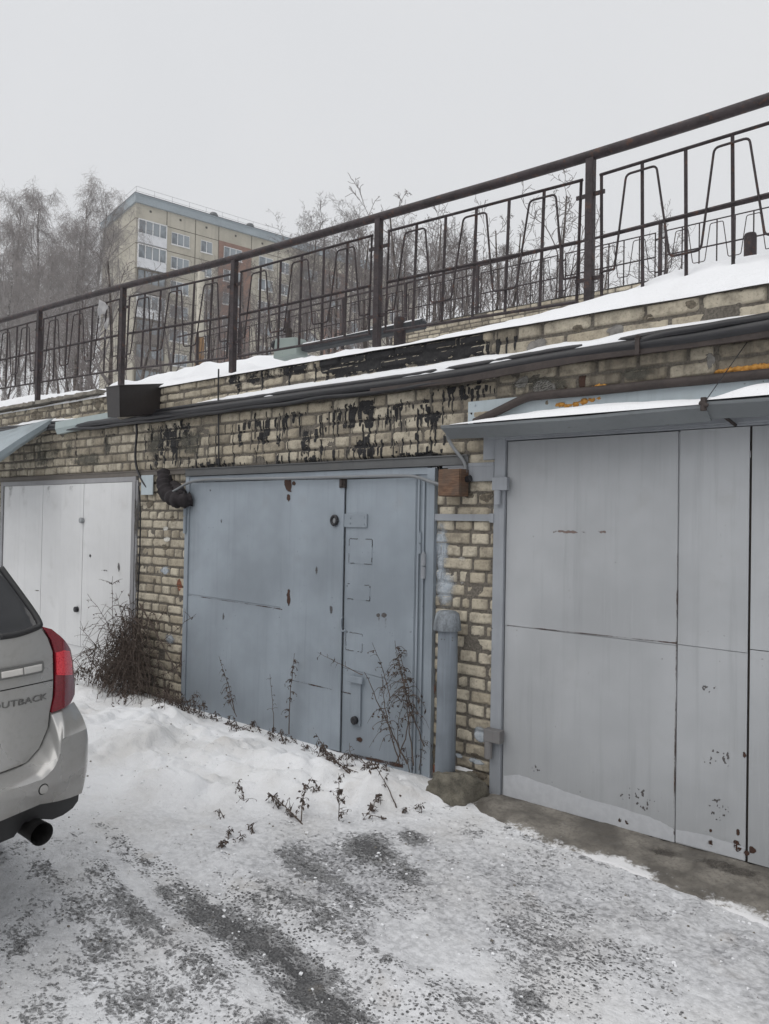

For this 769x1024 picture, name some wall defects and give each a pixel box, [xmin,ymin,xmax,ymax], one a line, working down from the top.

damp [228,333,518,395]
damp [141,380,495,474]
rust [284,480,296,502]
rust [733,829,756,856]